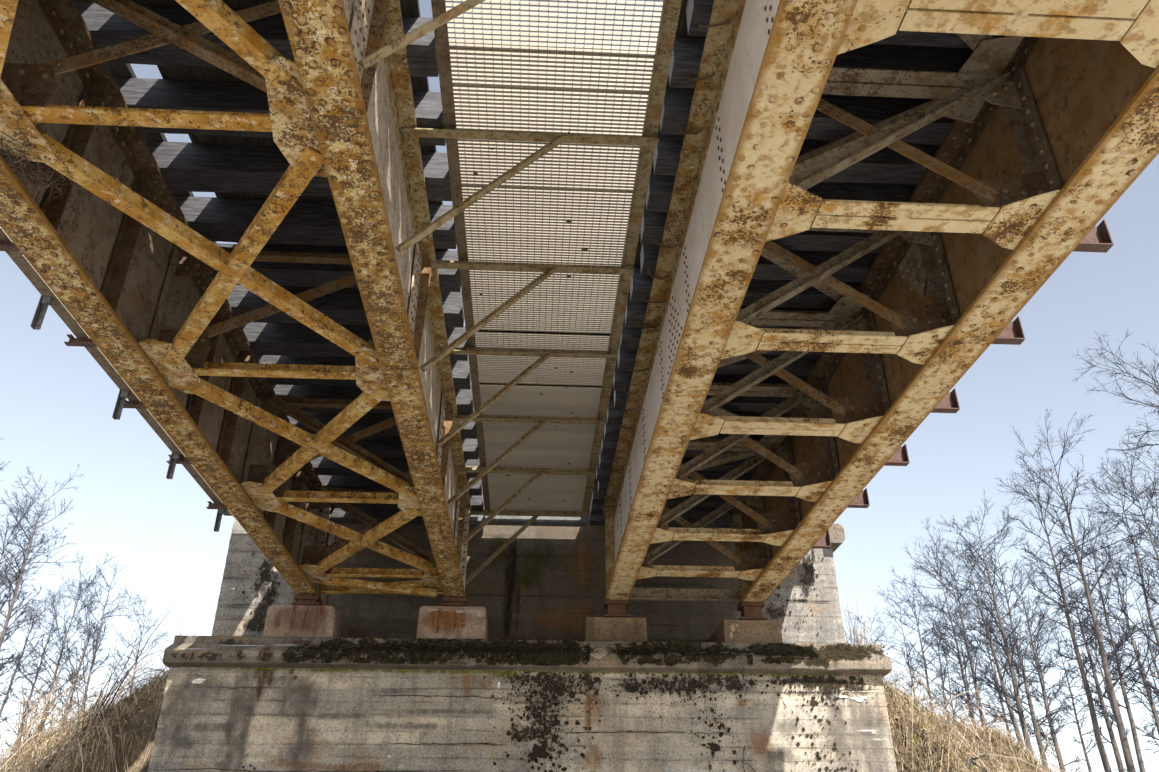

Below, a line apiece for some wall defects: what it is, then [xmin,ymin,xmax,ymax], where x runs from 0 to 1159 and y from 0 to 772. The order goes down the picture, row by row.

damp [161,544,359,769]
rust [423,610,465,631]
damp [504,544,522,653]
damp [379,710,488,728]
damp [483,671,889,772]